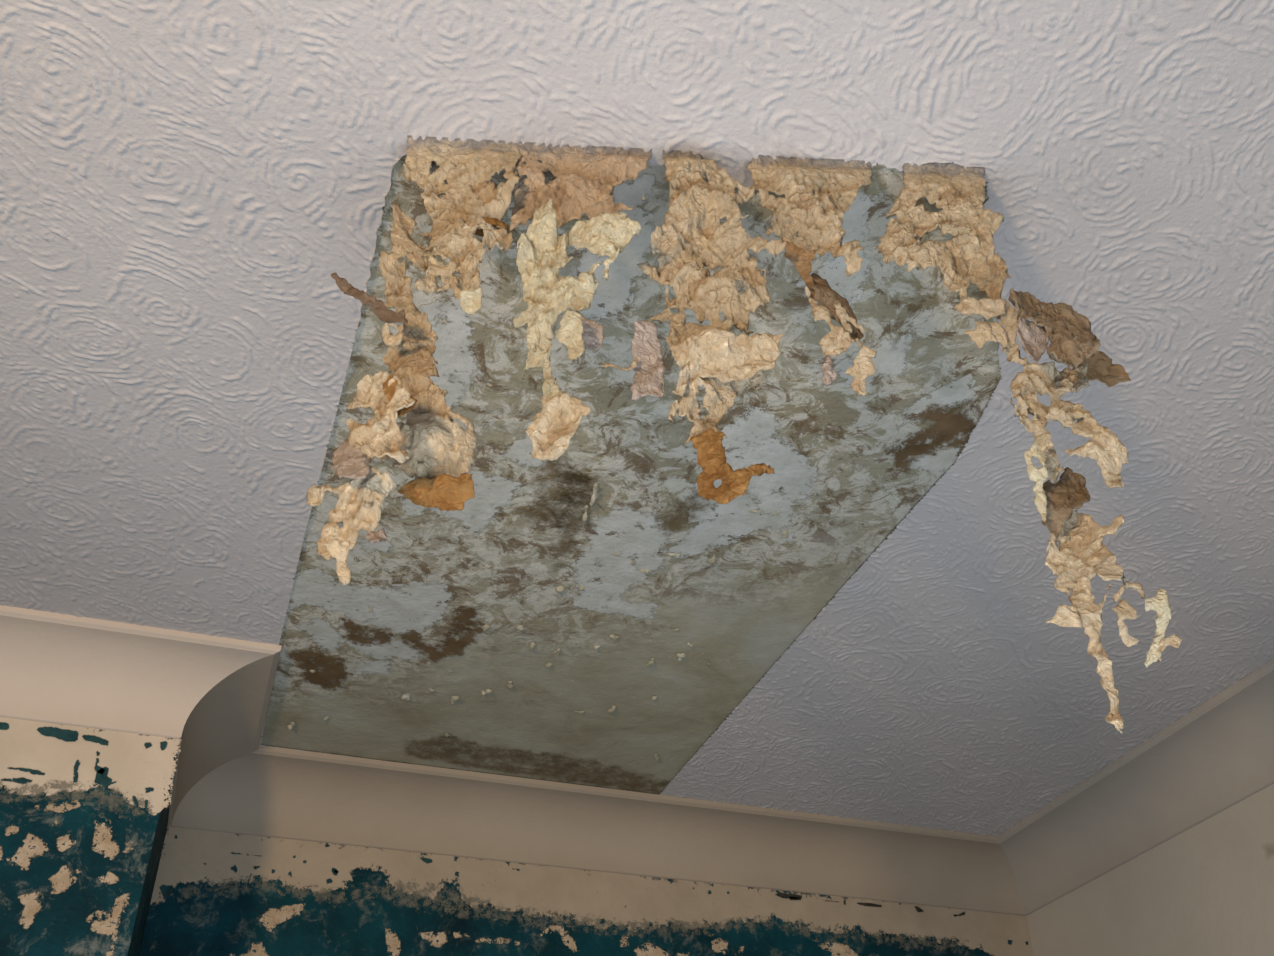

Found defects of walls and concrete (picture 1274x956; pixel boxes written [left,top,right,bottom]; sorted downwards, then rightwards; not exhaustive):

water stain [885,399,976,472]
flaking render [261,135,1182,794]
water stain [518,461,597,567]
water stain [658,494,704,531]
water stain [339,605,485,662]
water stain [286,649,352,690]
water stain [407,736,668,792]
peeling [0,800,81,929]
peeling [86,820,133,956]
peeling [230,903,304,956]
peeling [385,928,401,956]
peeling [420,931,520,948]